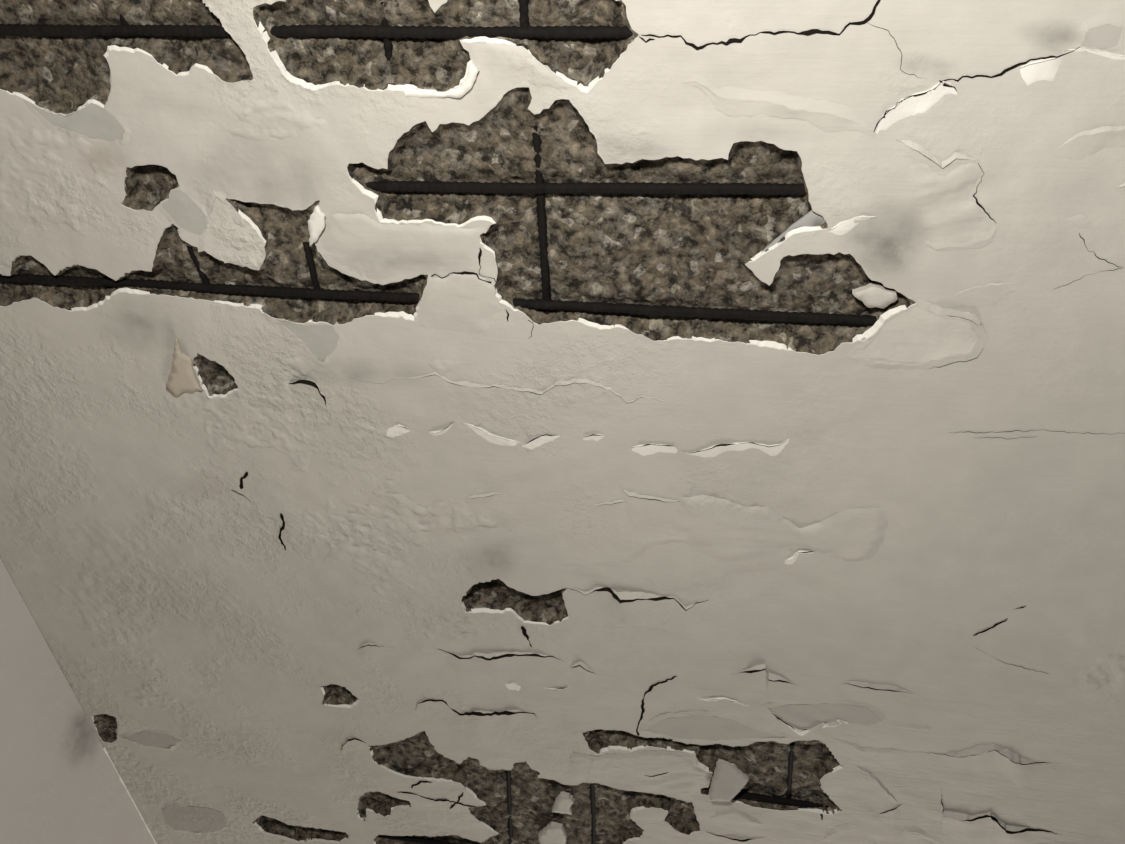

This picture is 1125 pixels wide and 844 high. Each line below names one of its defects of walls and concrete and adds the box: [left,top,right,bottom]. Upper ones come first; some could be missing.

spalling [0,0,253,146]
spalling [252,0,639,98]
crack [639,0,1079,131]
peeling [1020,12,1125,86]
spalling [0,164,428,367]
spalling [347,81,989,370]
spalling [166,338,238,399]
peeling [632,439,789,458]
peeling [461,578,709,640]
spalling [340,664,926,844]
crack [636,676,677,735]
spalling [253,815,350,844]